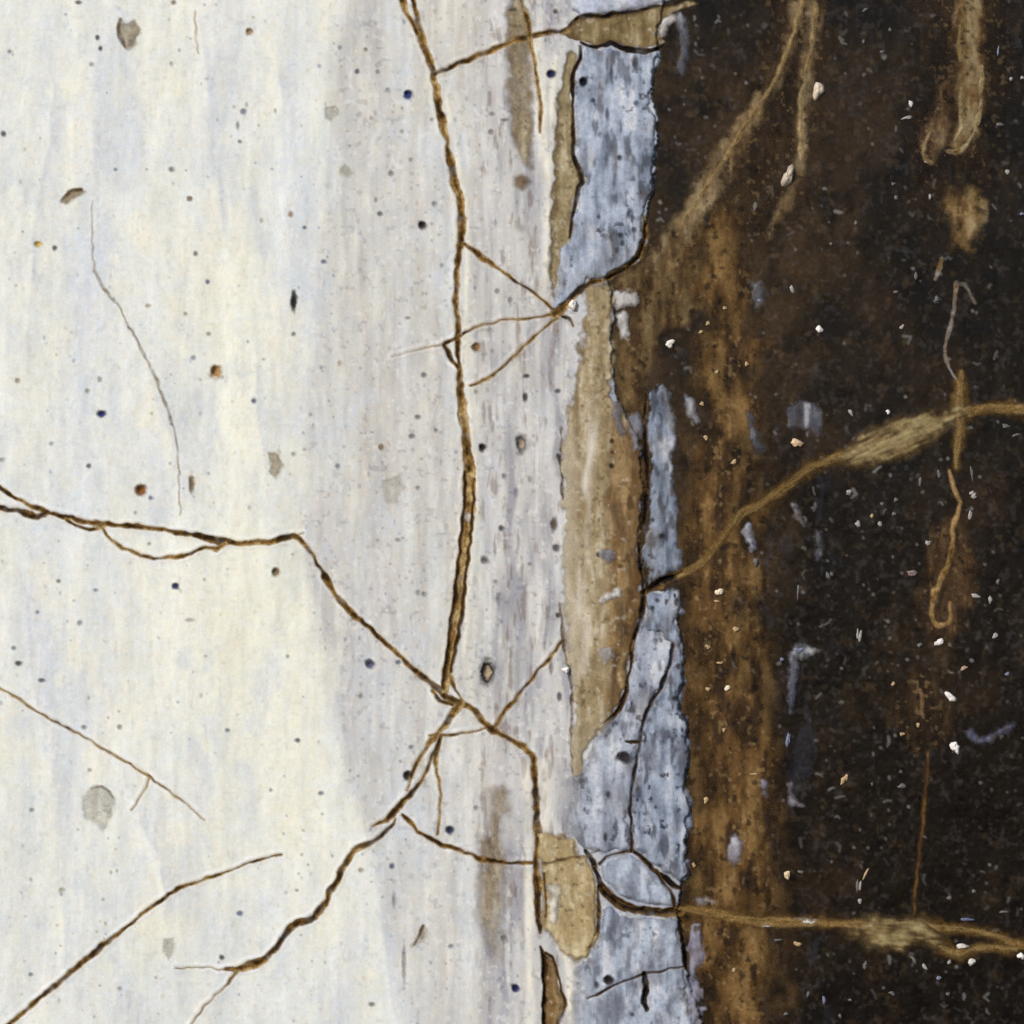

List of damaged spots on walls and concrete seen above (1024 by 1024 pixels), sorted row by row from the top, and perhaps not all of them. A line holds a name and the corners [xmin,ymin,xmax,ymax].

crack [0,0,648,1024]
peeling [537,0,706,1024]
crack [584,643,1024,1012]
crack [641,258,1024,628]